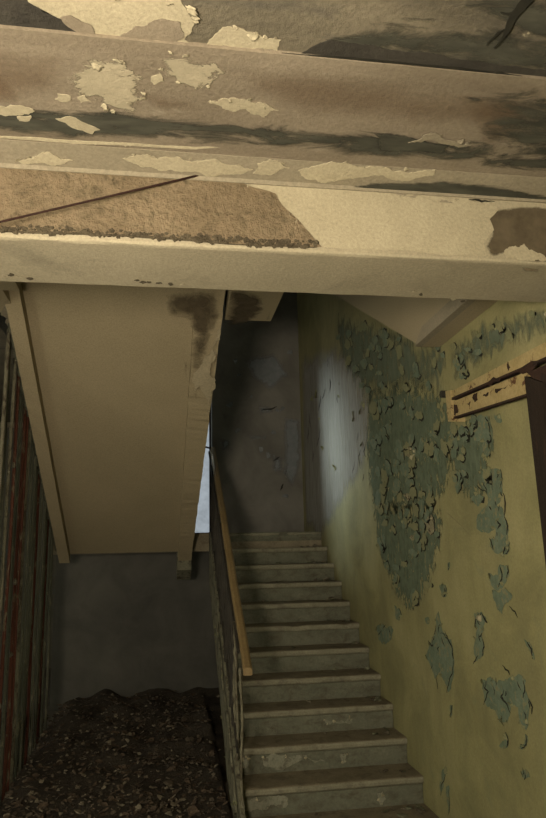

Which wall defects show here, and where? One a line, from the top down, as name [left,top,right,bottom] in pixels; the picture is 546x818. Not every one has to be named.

peeling [0,0,224,114]
peeling [207,25,281,51]
crack [284,53,521,76]
crack [486,0,533,48]
peeling [0,105,34,122]
peeling [209,97,278,118]
flaking render [0,116,498,256]
peeling [503,244,546,262]
water stain [169,295,216,353]
peeling [450,310,546,380]
peeling [425,612,454,692]
peeling [480,665,533,750]